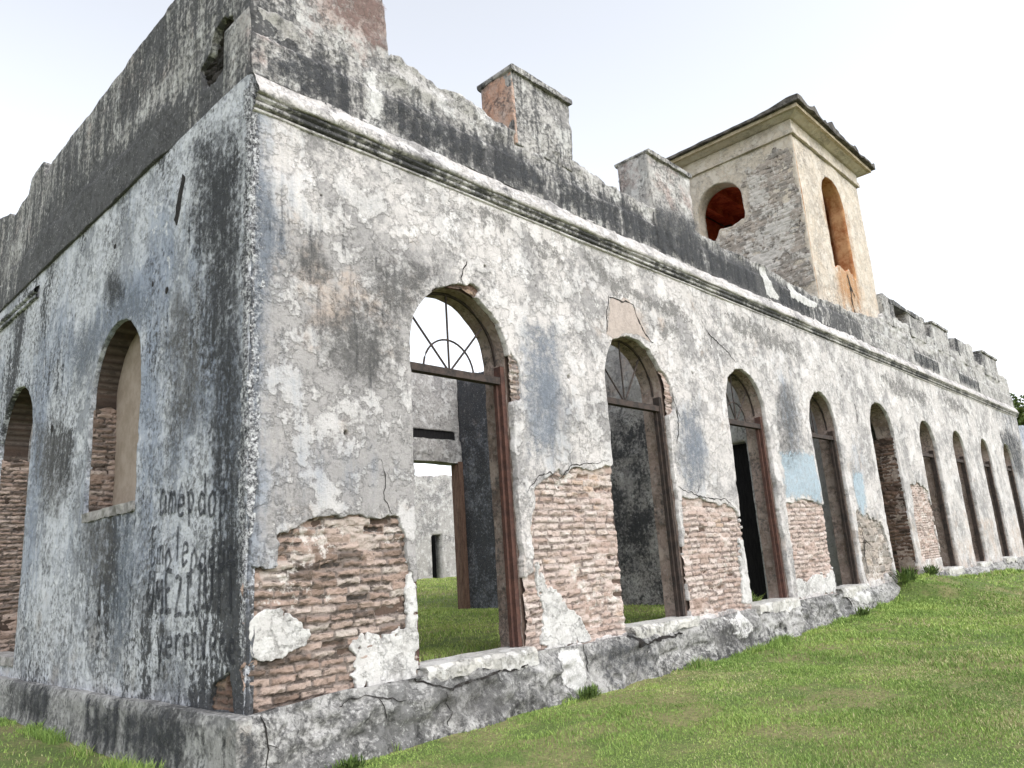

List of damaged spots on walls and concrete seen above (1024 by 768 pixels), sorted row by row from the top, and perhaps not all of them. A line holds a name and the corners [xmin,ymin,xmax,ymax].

leakage [363,70,545,194]
leakage [169,124,284,588]
leakage [299,245,329,283]
spalling [212,75,421,714]
peeling [584,254,693,342]
leakage [556,164,758,291]
crack [528,463,598,501]
spalling [522,466,626,693]
spalling [681,497,753,639]
spalling [786,499,837,599]
spalling [910,483,940,561]
crack [340,664,528,726]